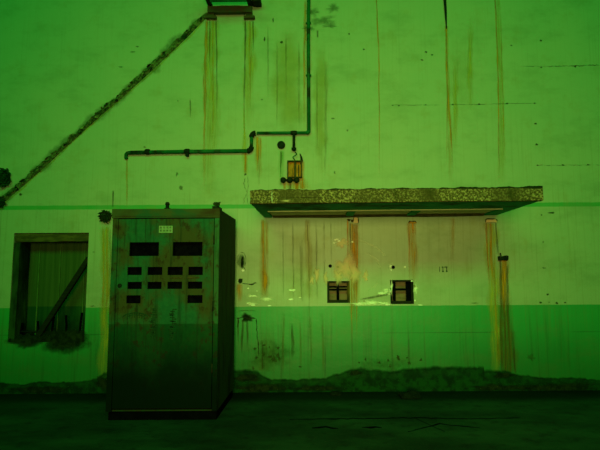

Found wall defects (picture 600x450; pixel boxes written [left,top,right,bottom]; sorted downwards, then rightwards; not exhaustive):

damp [233,344,600,393]
corrosion [486,224,515,369]